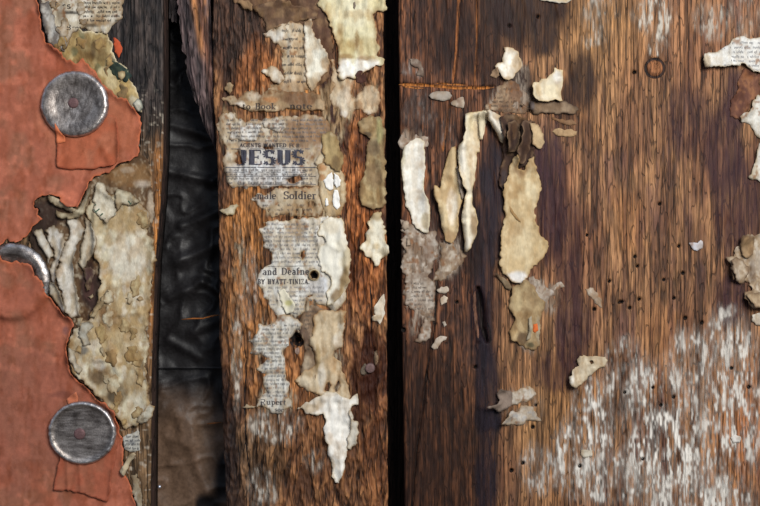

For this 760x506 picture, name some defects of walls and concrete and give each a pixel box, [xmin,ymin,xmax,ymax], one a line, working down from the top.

peeling [261,66,285,84]
peeling [317,0,387,80]
peeling [490,47,522,80]
peeling [532,68,563,102]
peeling [34,182,148,426]
peeling [295,217,359,483]
peeling [360,212,389,266]
peeling [401,109,504,252]
leakage [534,133,563,244]
peeling [726,234,760,309]
peeling [538,355,614,501]
peeling [626,309,759,506]